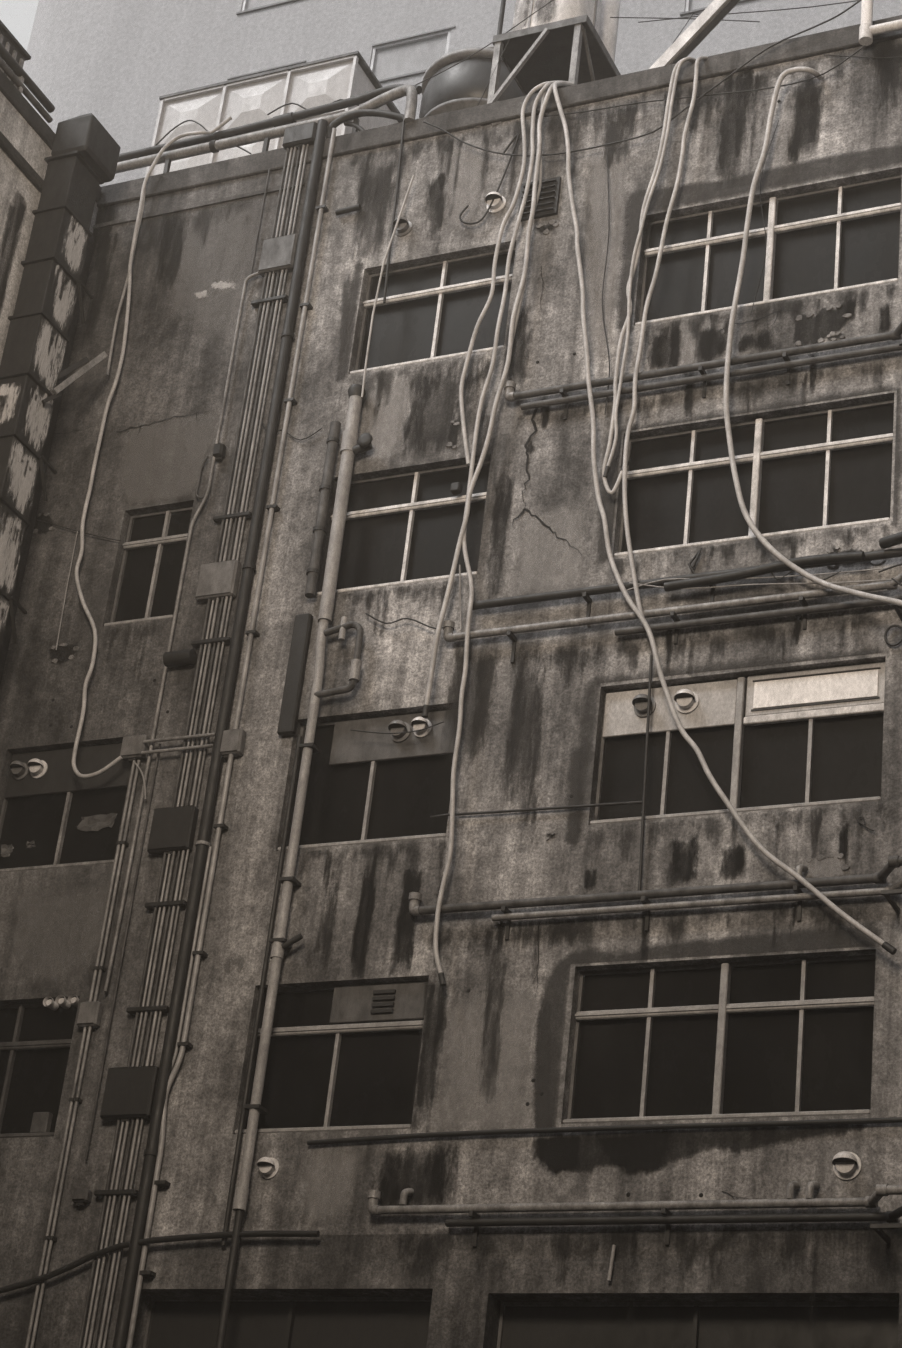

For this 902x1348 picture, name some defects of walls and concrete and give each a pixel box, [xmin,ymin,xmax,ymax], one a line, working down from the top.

damp [717,69,758,178]
damp [789,77,822,163]
damp [0,193,26,309]
damp [376,314,530,458]
damp [648,321,777,369]
damp [879,305,889,332]
crack [512,408,581,554]
damp [669,837,697,884]
damp [721,845,744,878]
damp [839,827,847,864]
damp [352,858,375,977]
damp [394,869,420,965]